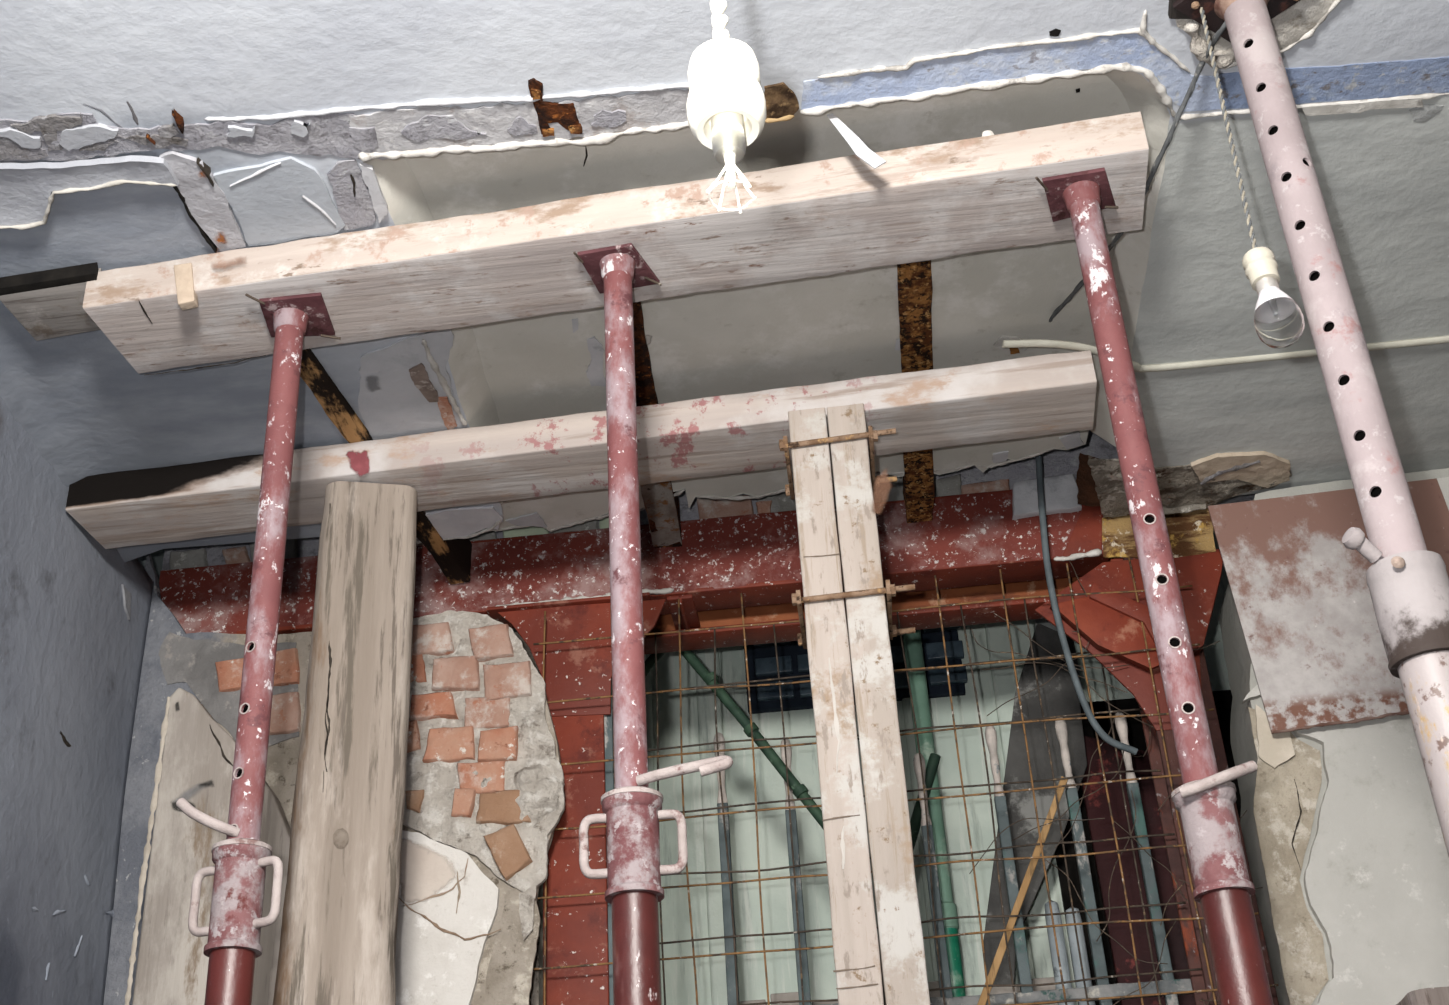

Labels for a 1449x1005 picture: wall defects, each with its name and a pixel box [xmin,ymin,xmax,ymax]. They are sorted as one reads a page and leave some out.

flaking render [1271,0,1342,53]
corrosion [172,109,184,134]
corrosion [146,133,246,253]
flaking render [0,83,689,230]
corrosion [542,123,582,137]
hole [764,82,799,123]
peeling [827,113,886,169]
spalling [674,489,796,521]
flaking render [934,431,1138,558]
flaking render [1155,451,1292,558]
flaking render [403,610,565,1005]
flaking render [1248,705,1329,1005]